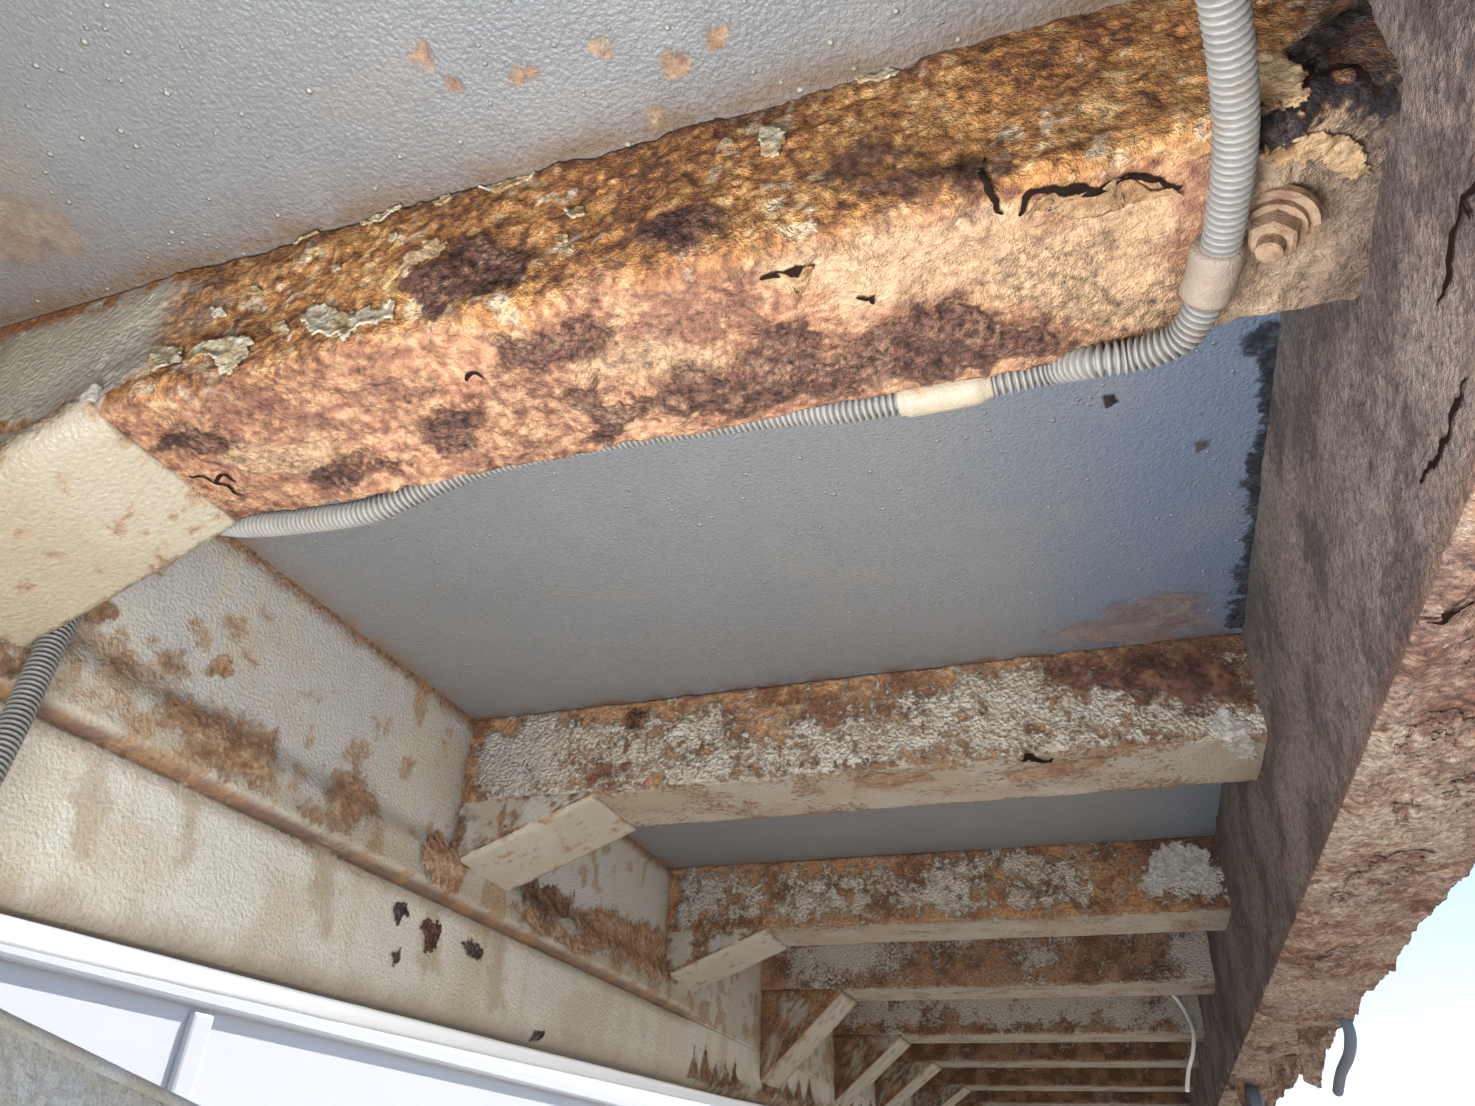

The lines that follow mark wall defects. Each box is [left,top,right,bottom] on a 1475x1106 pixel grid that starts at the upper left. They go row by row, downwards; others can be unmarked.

peeling [1258,49,1312,112]
rust [1259,0,1403,153]
crack [977,157,1183,221]
peeling [1258,130,1372,180]
rust [393,232,536,323]
crack [759,264,815,298]
crack [1436,182,1475,306]
peeling [146,335,255,375]
rust [488,290,1078,448]
rust [308,408,485,490]
crack [1419,378,1467,484]
peeling [393,902,442,954]